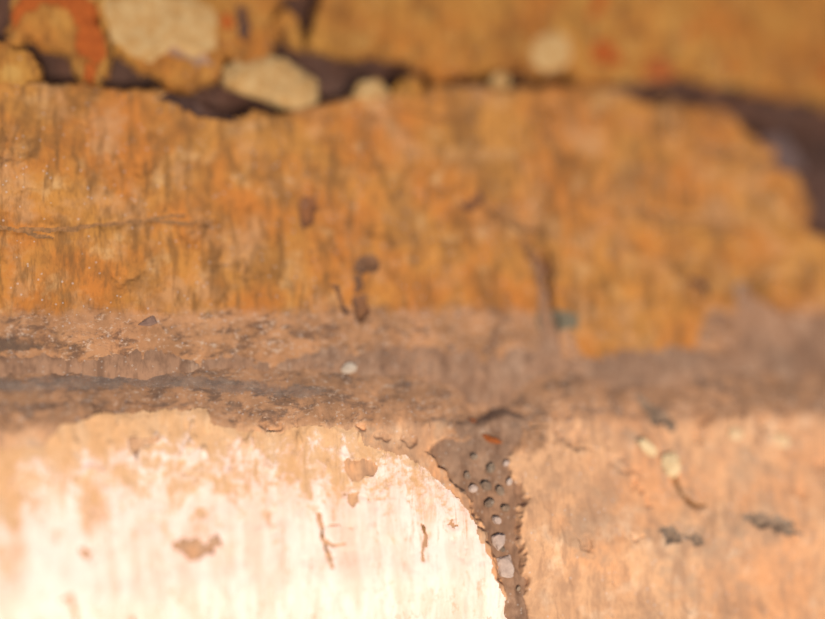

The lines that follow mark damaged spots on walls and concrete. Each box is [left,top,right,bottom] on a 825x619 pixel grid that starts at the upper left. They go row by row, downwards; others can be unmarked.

spalling [351,76,423,99]
spalling [160,91,251,122]
peeling [758,132,805,172]
spalling [299,196,318,229]